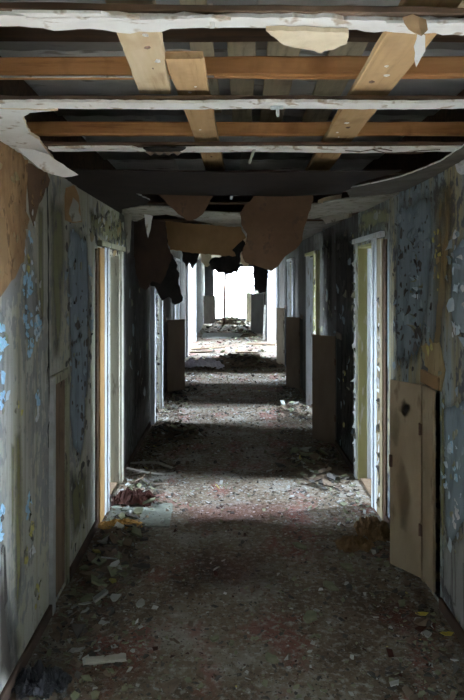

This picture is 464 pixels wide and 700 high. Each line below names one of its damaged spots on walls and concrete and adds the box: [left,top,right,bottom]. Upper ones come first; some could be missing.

spalling [266,26,349,53]
spalling [0,141,50,358]
peeling [313,228,356,469]
peeling [392,185,464,392]
peeling [439,387,464,553]